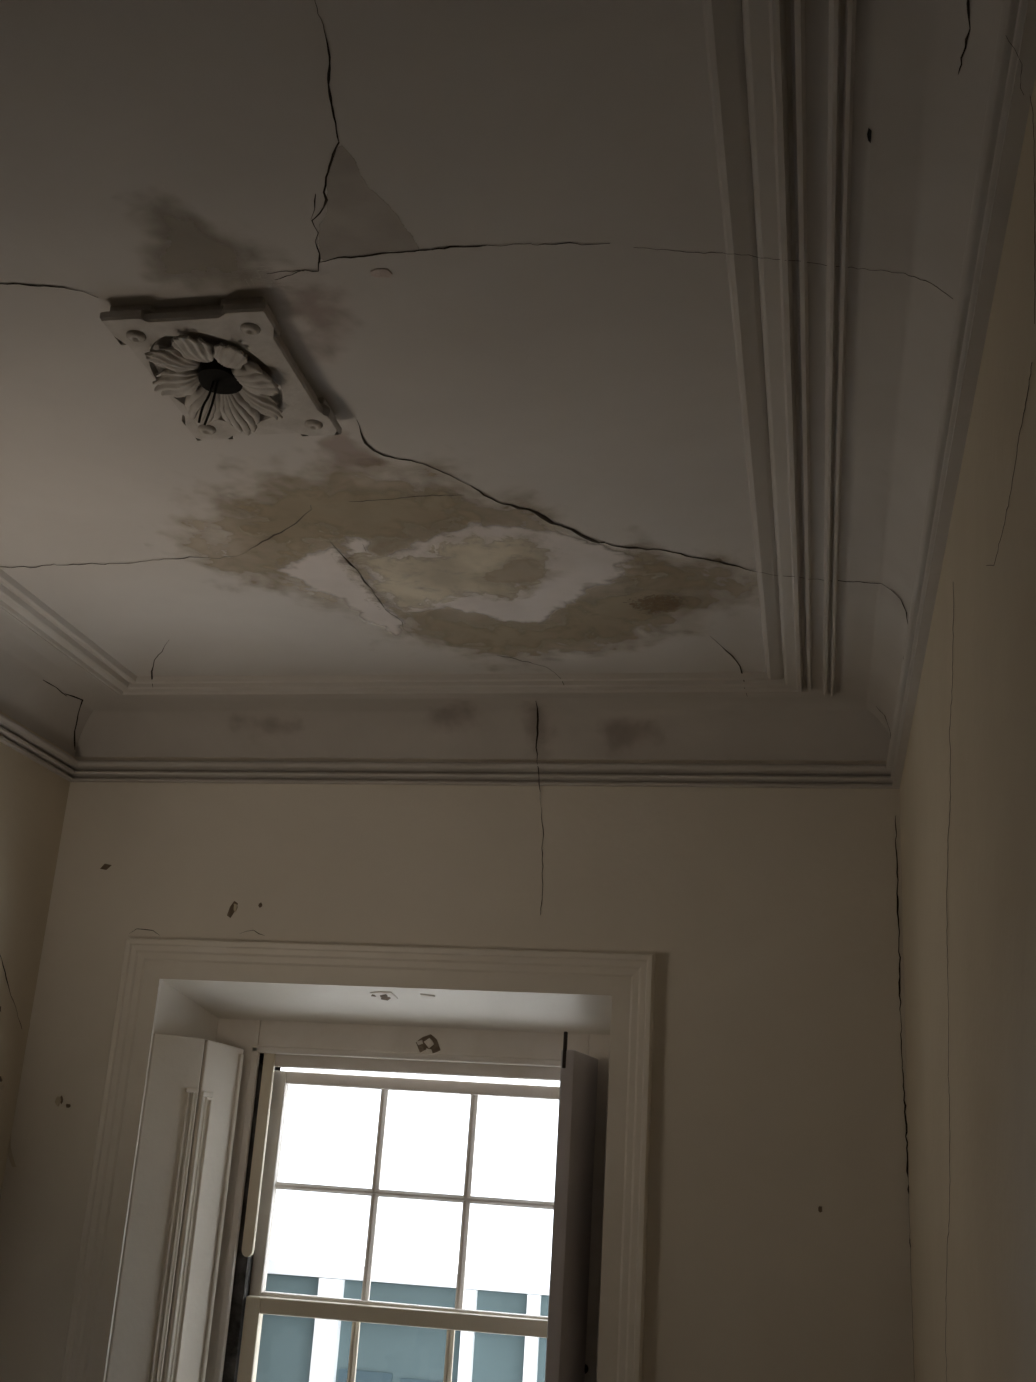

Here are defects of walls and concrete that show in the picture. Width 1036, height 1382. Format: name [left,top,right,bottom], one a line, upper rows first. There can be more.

crack [958,0,970,74]
crack [267,2,953,299]
crack [0,283,98,298]
crack [7,509,312,568]
crack [331,543,414,638]
peeling [278,523,633,635]
water stain [189,460,753,655]
crack [349,421,908,623]
crack [895,815,947,1378]